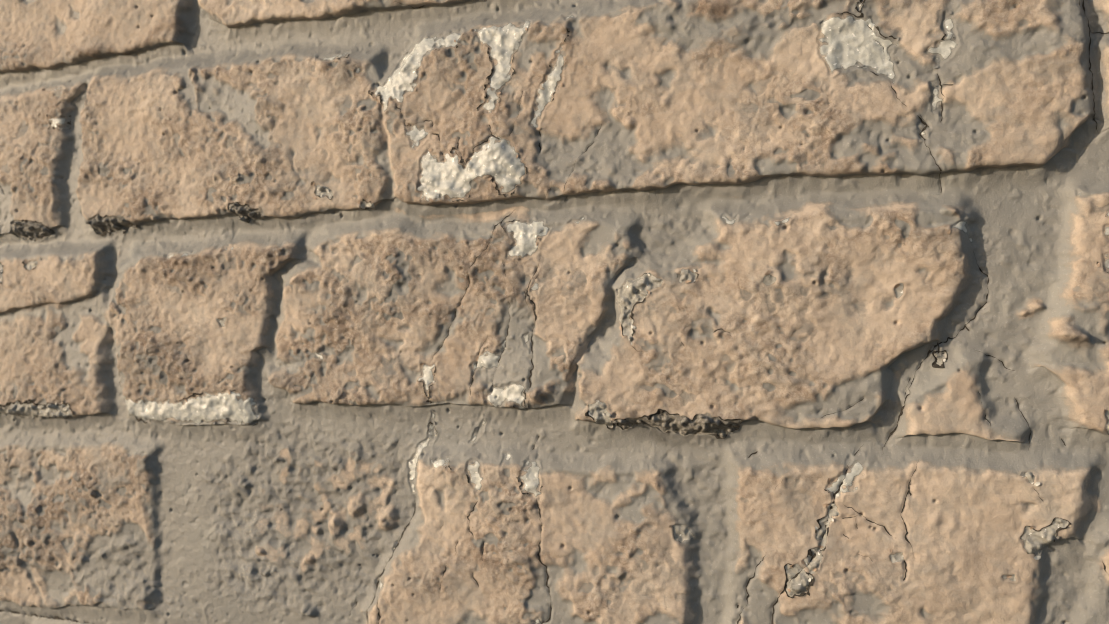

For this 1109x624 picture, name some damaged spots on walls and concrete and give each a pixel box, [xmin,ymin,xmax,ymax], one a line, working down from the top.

peeling [368,20,530,113]
peeling [819,0,899,83]
crack [1079,0,1109,130]
peeling [404,123,527,205]
crack [432,214,511,359]
crack [470,257,541,407]
peeling [500,220,548,257]
peeling [119,382,259,426]
spalling [584,400,742,439]
crack [737,261,1014,624]
crack [349,504,416,624]
crack [534,500,552,624]